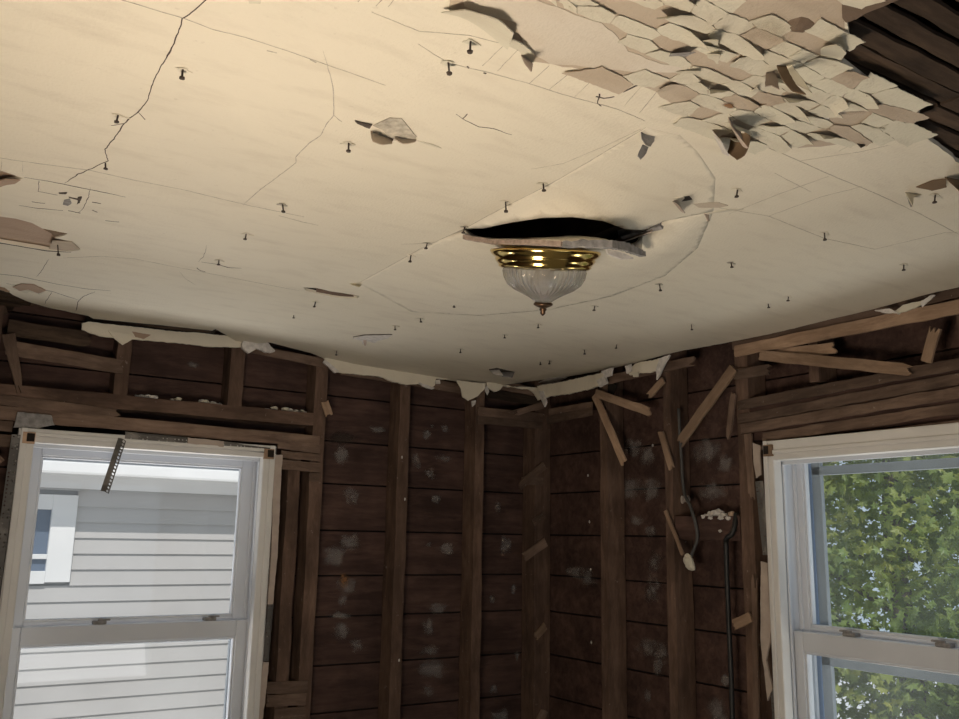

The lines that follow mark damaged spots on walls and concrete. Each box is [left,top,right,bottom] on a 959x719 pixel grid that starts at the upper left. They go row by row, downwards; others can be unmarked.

peeling [449,0,938,160]
crack [0,0,386,225]
peeling [355,117,441,148]
crack [358,0,657,280]
peeling [0,171,20,187]
spalling [59,192,82,206]
peeling [905,177,959,207]
peeling [0,217,80,252]